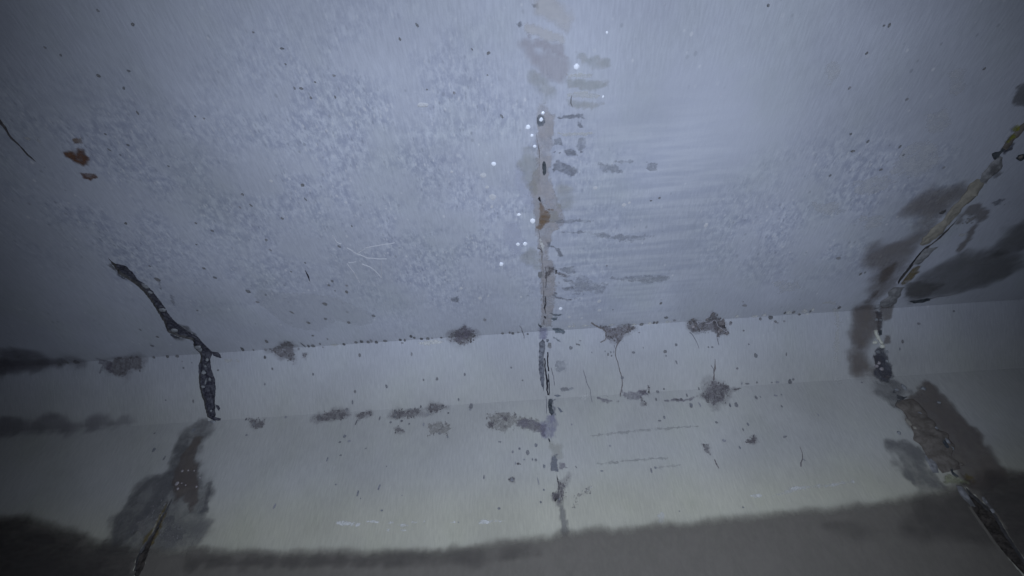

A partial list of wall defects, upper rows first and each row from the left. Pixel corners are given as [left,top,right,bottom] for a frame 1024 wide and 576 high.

crack [0,120,36,162]
corrosion [64,138,97,180]
leakage [909,211,1024,293]
crack [519,234,547,336]
crack [544,352,555,395]
leakage [0,304,1024,576]
crack [552,478,567,500]